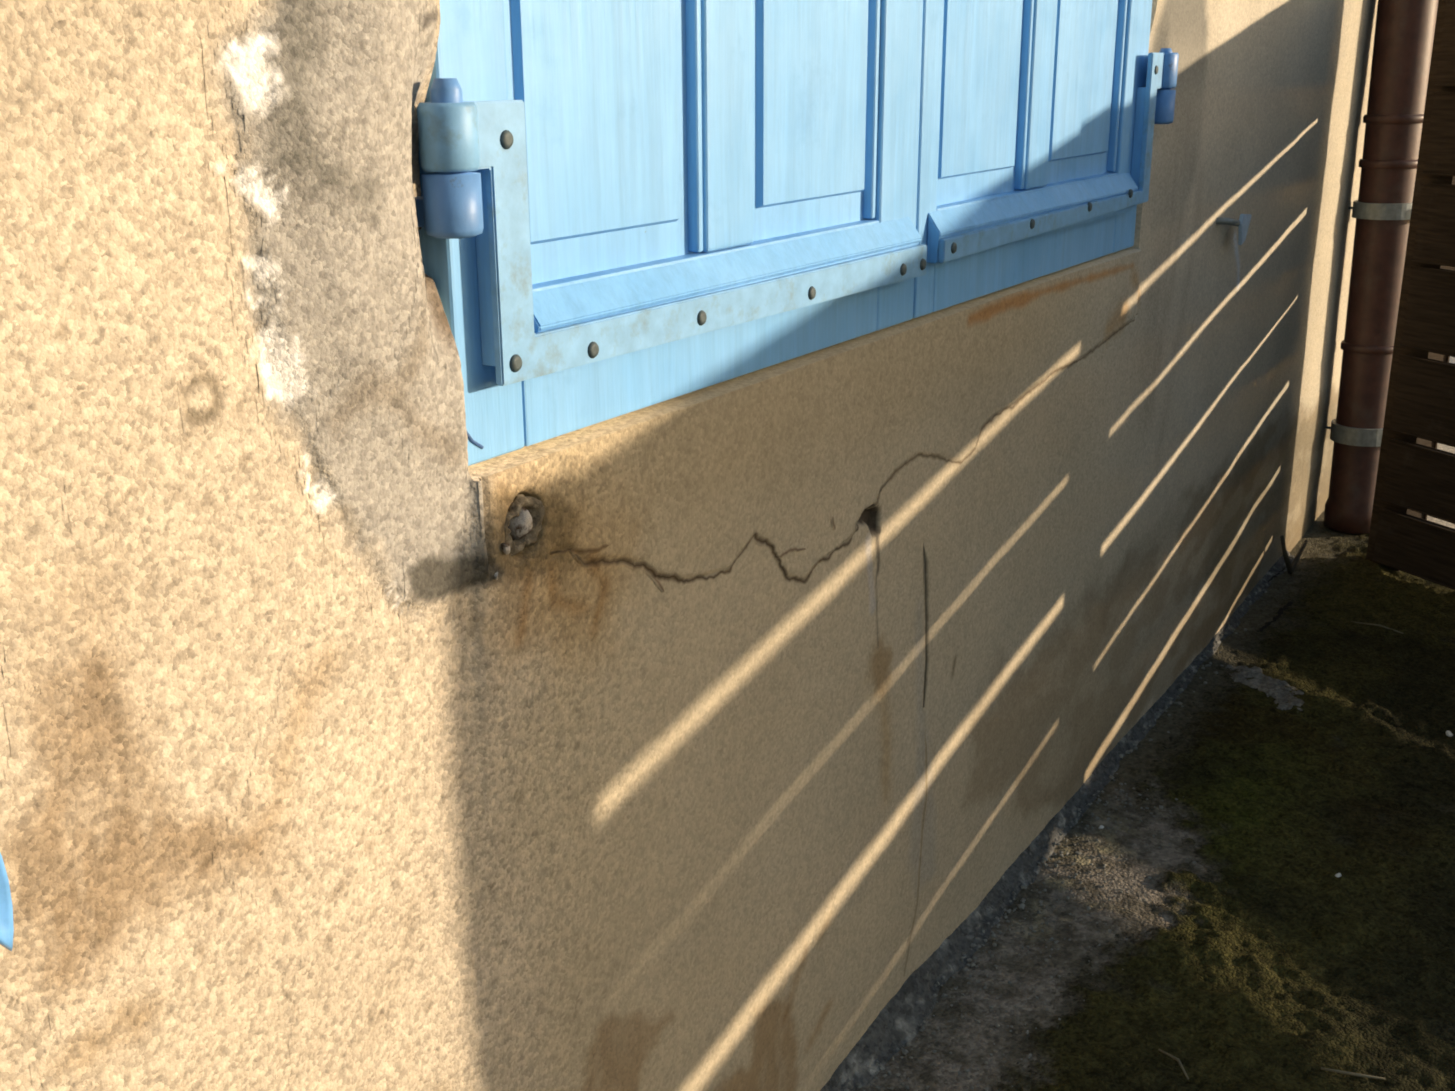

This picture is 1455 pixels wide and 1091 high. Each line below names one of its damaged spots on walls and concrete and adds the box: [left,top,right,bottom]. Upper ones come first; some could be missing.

corrosion [447,443,663,717]
crack [551,313,1138,592]
spalling [854,498,883,539]
leakage [861,525,940,906]
crack [903,543,930,977]
corrosion [965,252,1143,358]
leakage [958,0,1378,826]
leakage [574,1000,680,1091]
leakage [705,900,837,1091]